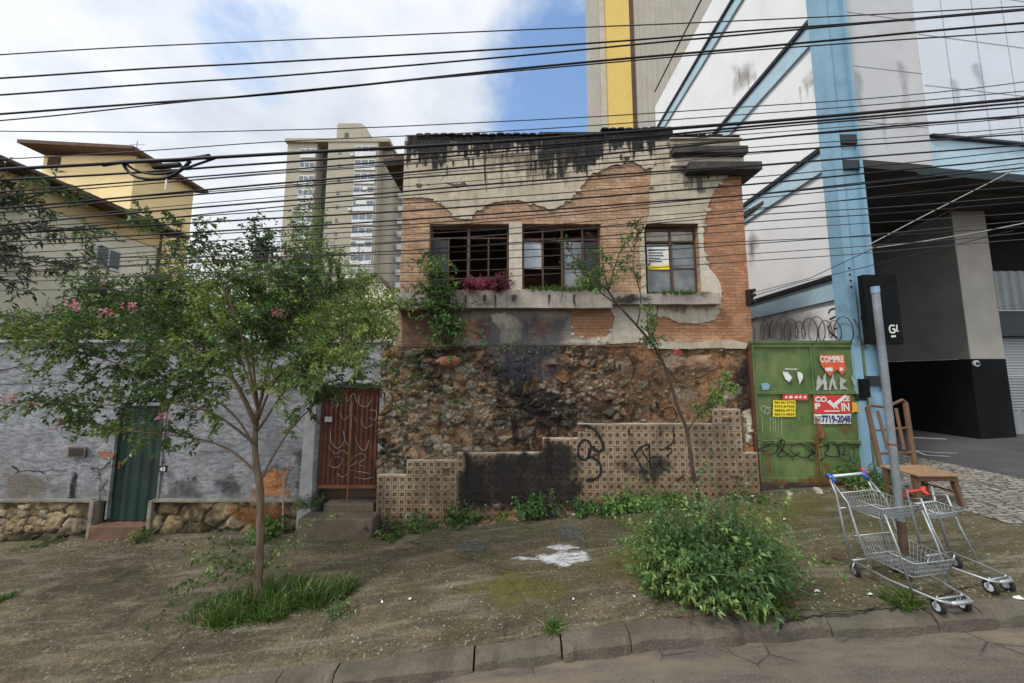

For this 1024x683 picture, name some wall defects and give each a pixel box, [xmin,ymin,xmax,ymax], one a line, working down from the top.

damp [406,130,670,184]
flaking render [400,159,654,294]
flaking render [401,310,523,345]
flaking render [565,310,614,345]
corrosion [800,418,844,485]
peeling [251,464,294,498]